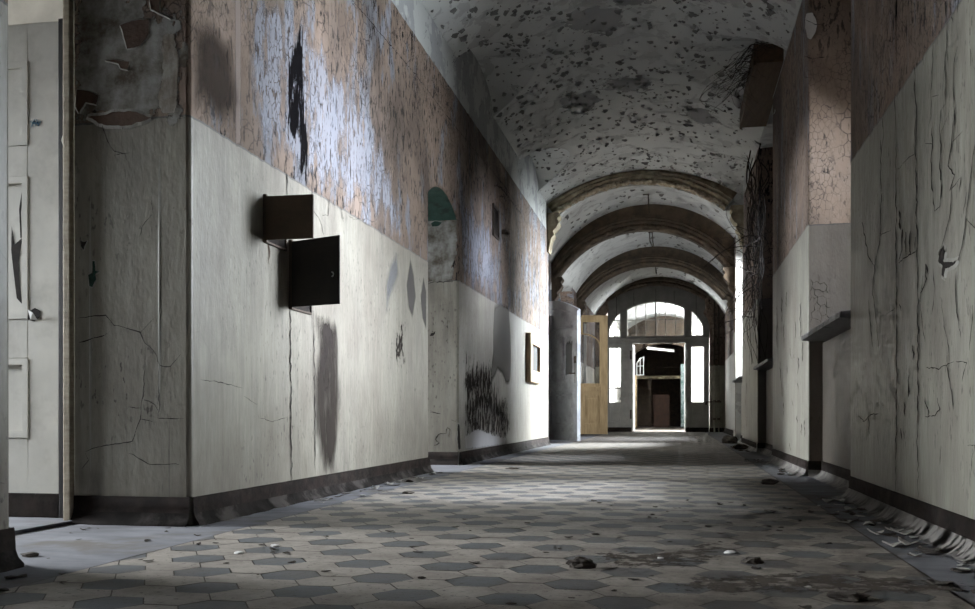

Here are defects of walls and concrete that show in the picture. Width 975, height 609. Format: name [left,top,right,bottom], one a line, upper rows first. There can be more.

flaking render [74,0,188,130]
water stain [288,23,308,179]
crack [862,140,894,347]
crack [920,95,975,417]
peeling [938,243,959,280]
water stain [317,317,338,468]